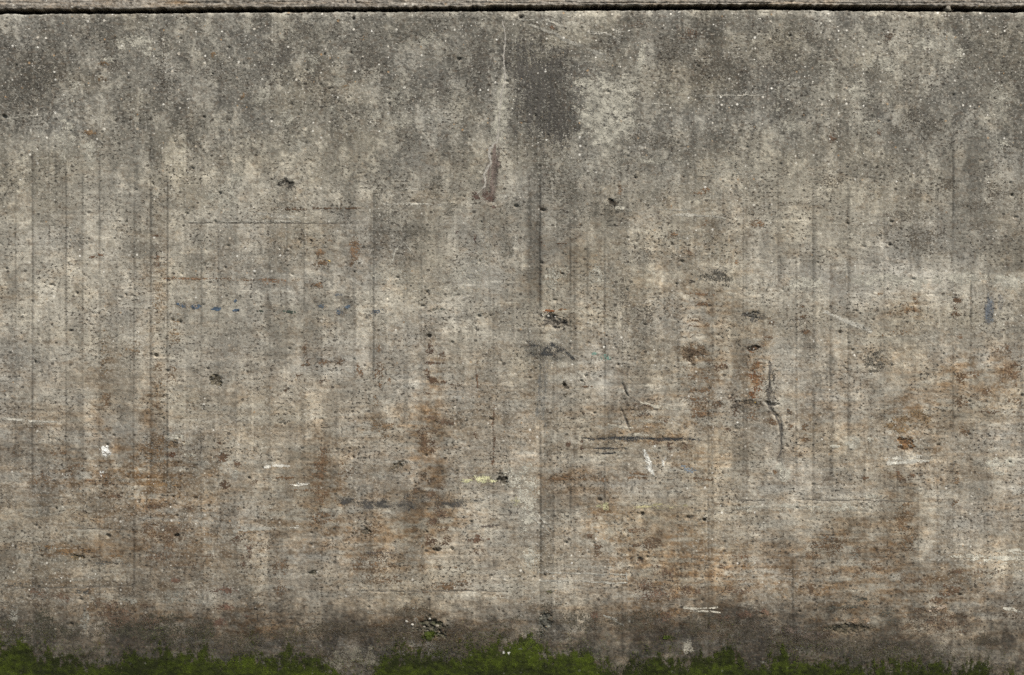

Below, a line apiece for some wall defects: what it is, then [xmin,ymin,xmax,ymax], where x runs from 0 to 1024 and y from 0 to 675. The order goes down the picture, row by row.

water stain [253,21,324,93]
water stain [655,26,834,94]
crack [476,21,506,195]
water stain [423,33,623,319]
water stain [935,175,1015,214]
water stain [881,211,947,253]
crack [766,382,783,459]